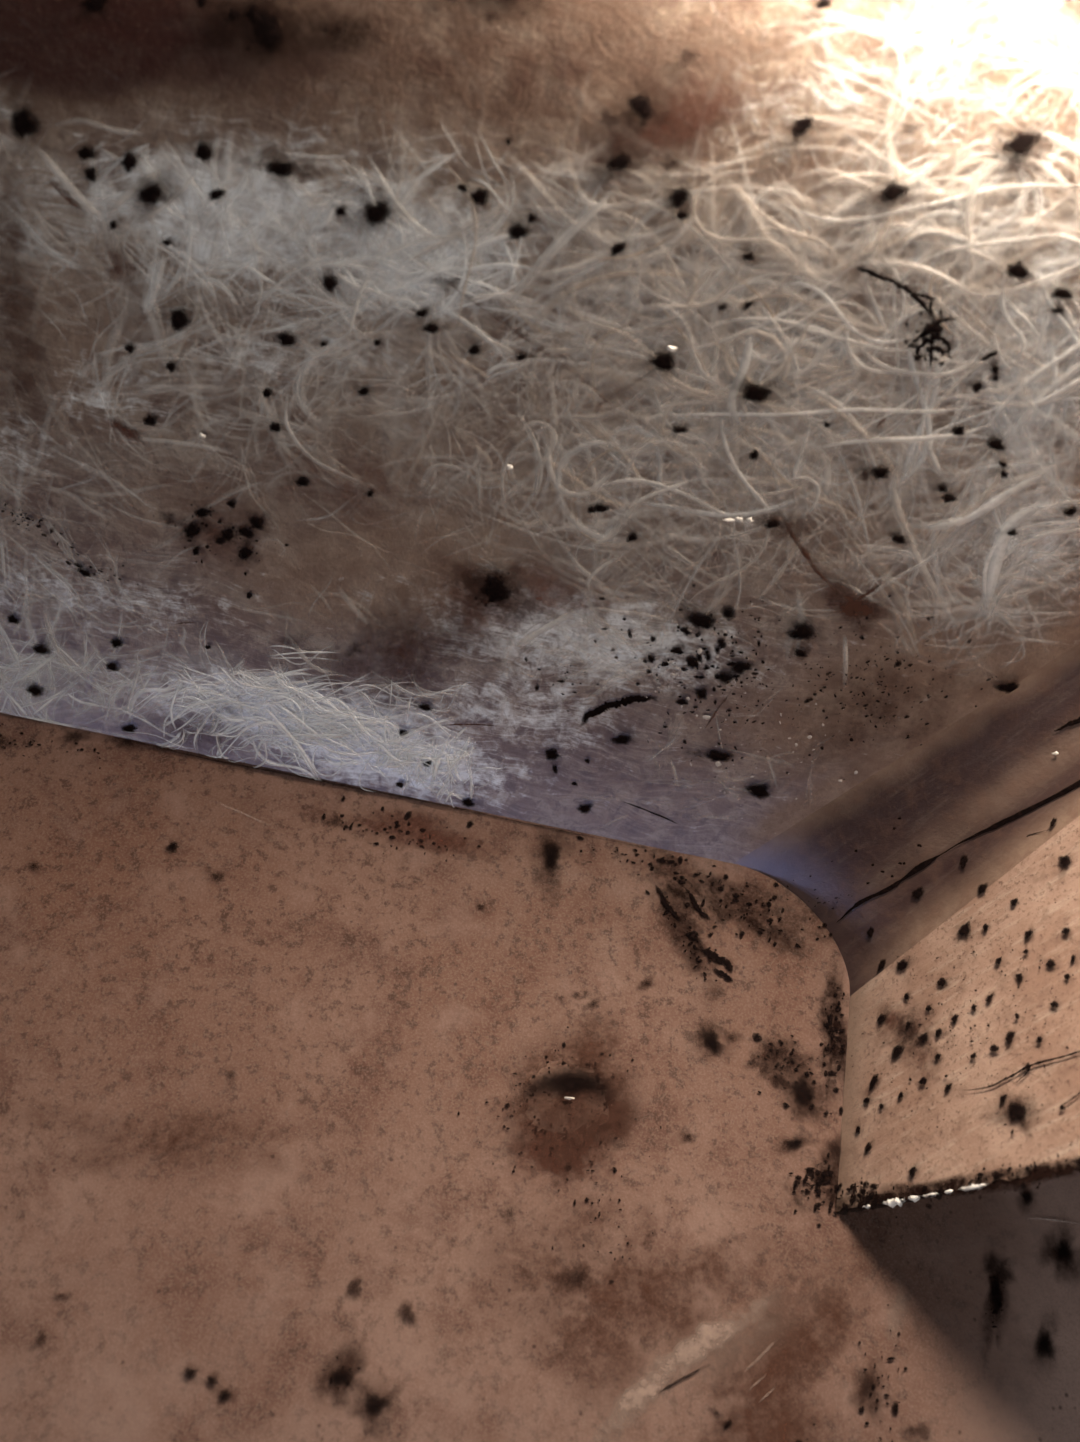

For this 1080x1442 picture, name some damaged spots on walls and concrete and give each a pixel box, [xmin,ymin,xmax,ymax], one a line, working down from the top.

damp [792,117,813,144]
damp [992,122,1047,173]
mould [336,202,390,226]
damp [866,182,909,202]
damp [1006,261,1031,280]
mould [856,268,958,368]
damp [1049,288,1074,314]
crack [1054,717,1080,732]
damp [116,724,849,981]
crack [837,780,1080,922]
damp [877,883,1080,1135]
mould [752,977,863,1116]